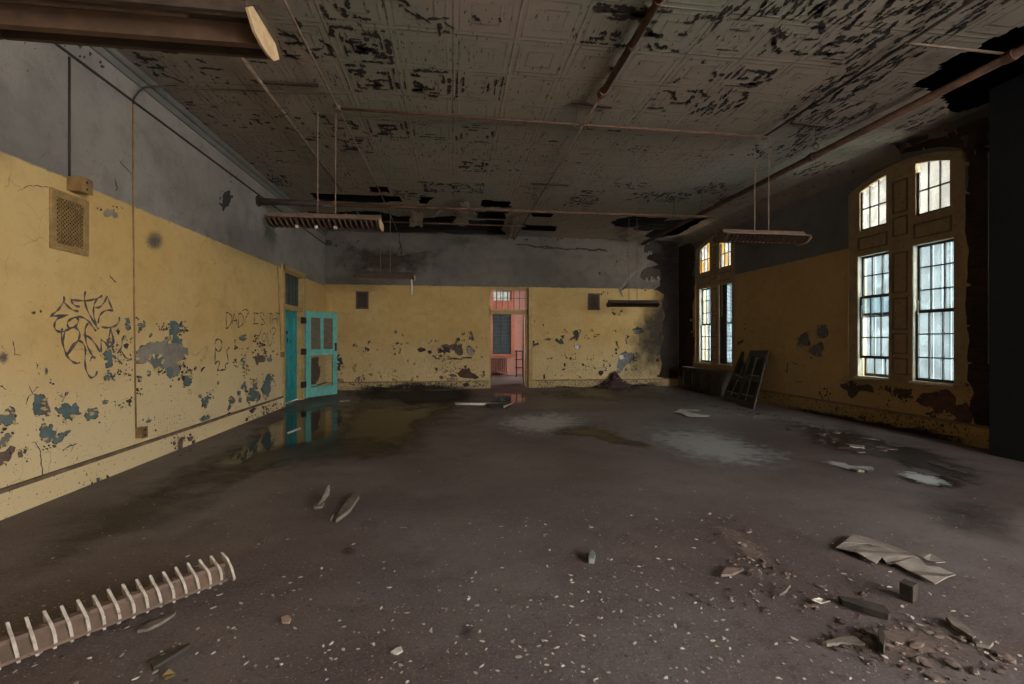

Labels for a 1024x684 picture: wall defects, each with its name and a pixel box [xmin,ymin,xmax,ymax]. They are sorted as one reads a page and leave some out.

peeling [277,0,465,98]
peeling [580,2,679,53]
peeling [678,0,1010,161]
spalling [0,406,29,473]
peeling [32,317,214,451]
peeling [227,331,292,421]
spalling [337,330,485,389]
leakage [360,382,468,427]
leakage [489,410,791,466]
leakage [632,288,672,374]
flaking render [640,235,695,378]
flaking render [818,106,989,426]